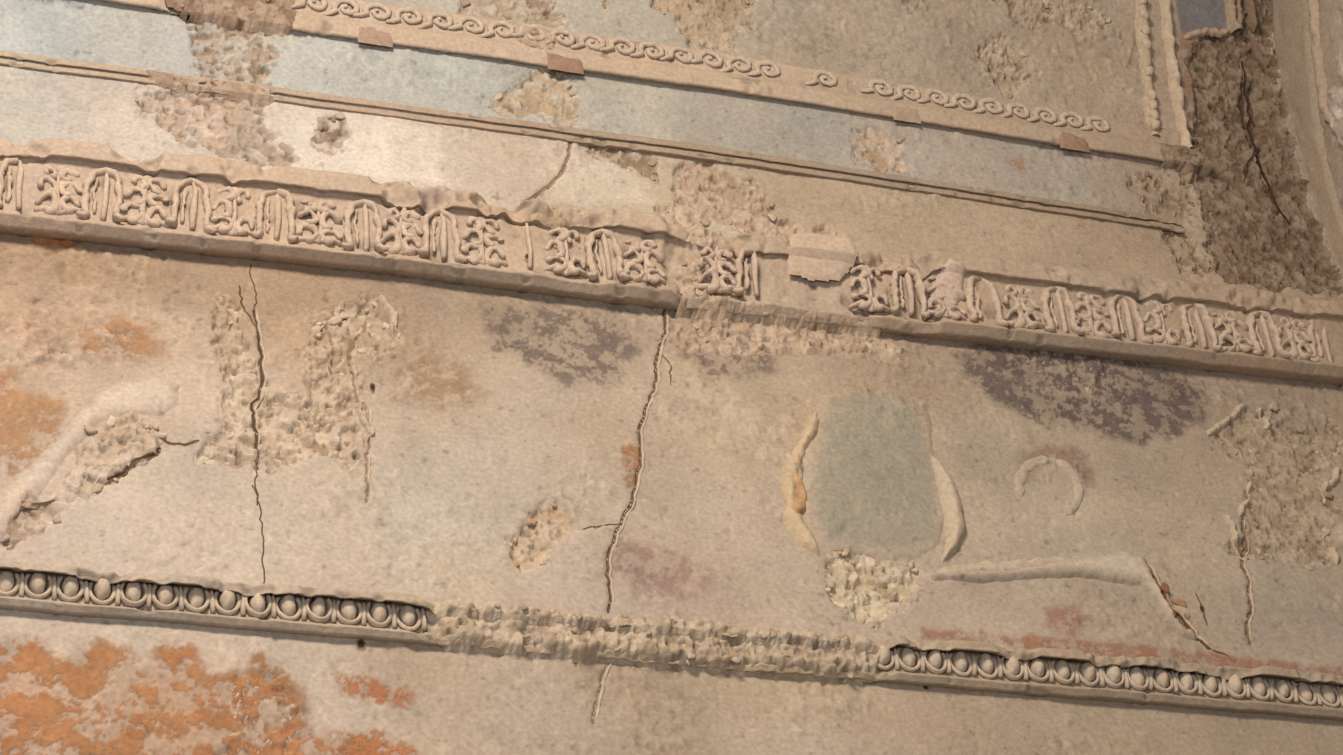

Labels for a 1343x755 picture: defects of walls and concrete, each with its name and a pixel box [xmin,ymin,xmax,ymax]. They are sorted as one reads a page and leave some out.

spalling [133,4,353,167]
spalling [1125,0,1343,298]
crack [1241,61,1289,223]
spalling [0,412,167,551]
crack [239,264,267,583]
spalling [194,291,405,478]
damp [492,308,634,383]
crack [583,309,672,613]
damp [965,344,1202,443]
spalling [1206,401,1343,571]
spalling [823,549,934,631]
crack [1148,517,1255,662]